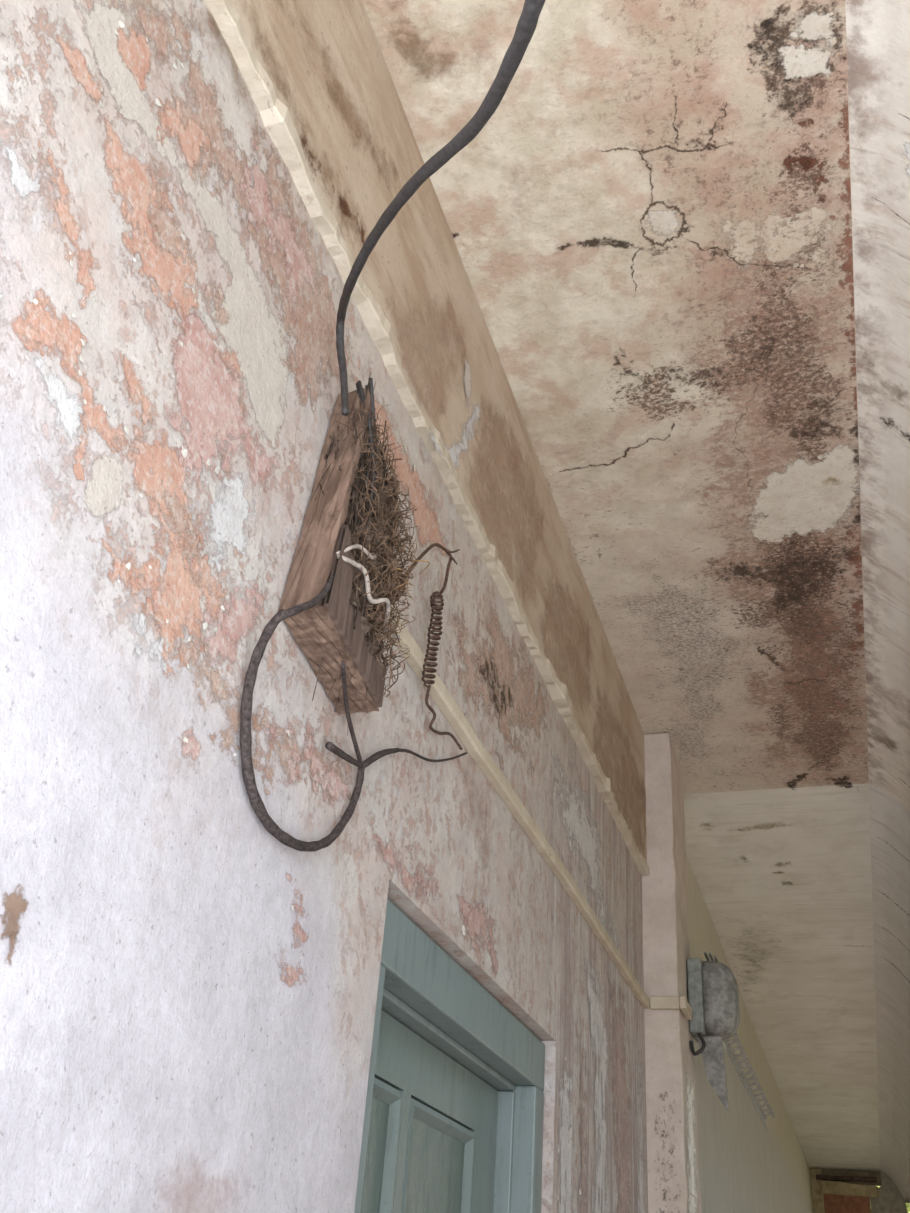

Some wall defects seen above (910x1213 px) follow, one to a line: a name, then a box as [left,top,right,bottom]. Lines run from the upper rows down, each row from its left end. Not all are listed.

spalling [777,10,839,82]
crack [558,96,806,291]
water stain [607,1,851,464]
peeling [11,0,358,818]
peeling [374,396,449,556]
crack [559,423,675,472]
spalling [690,190,861,770]
water stain [707,521,863,773]
corrosion [0,884,29,964]
peeling [275,872,311,987]
peeling [374,830,443,925]
peeling [457,895,498,972]